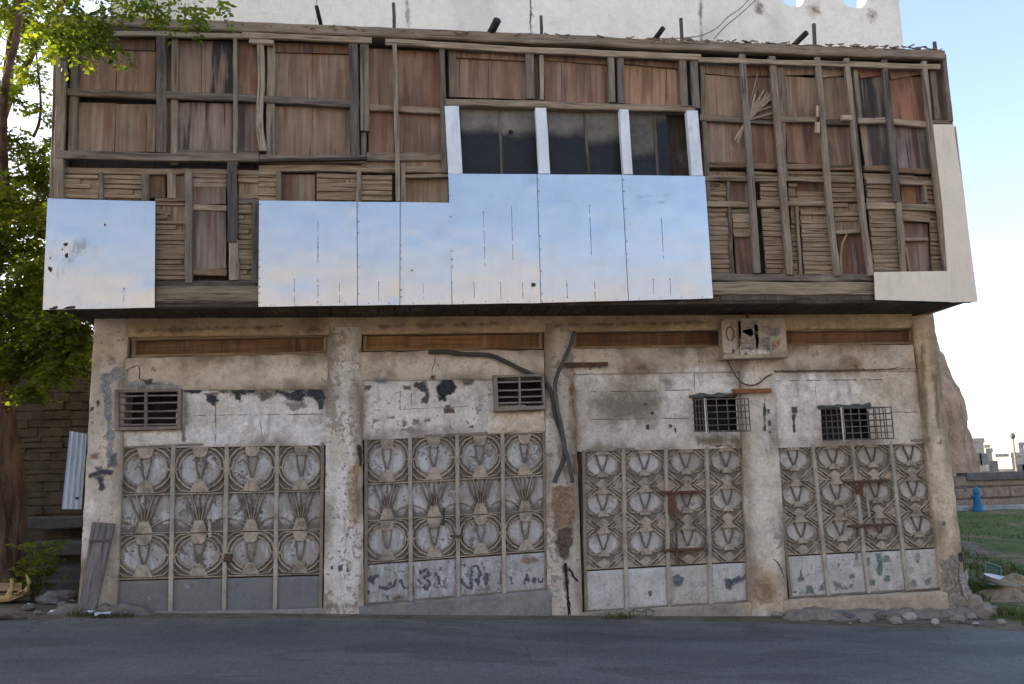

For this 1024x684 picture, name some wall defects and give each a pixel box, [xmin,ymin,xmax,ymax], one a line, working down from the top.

peeling [90,366,326,468]
peeling [403,379,474,414]
spalling [550,485,578,560]
peeling [794,570,855,594]
peeling [855,552,890,586]
spalling [910,545,972,608]